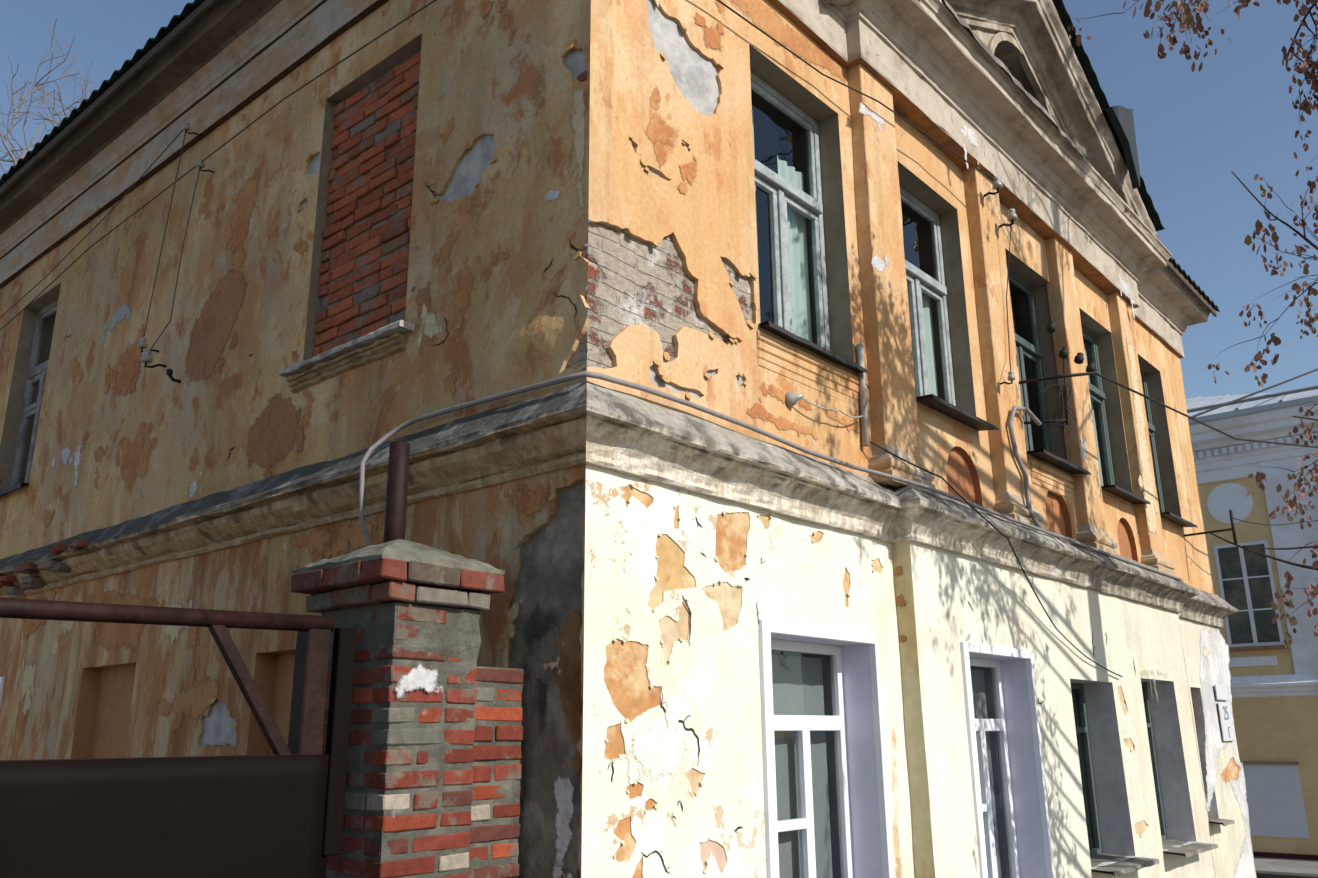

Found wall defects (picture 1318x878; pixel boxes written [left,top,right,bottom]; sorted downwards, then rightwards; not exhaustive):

flaking render [646,0,848,116]
flaking render [430,135,497,203]
peeling [564,42,587,209]
peeling [629,88,697,194]
flaking render [566,223,758,399]
peeling [736,372,871,440]
peeling [624,483,653,508]
peeling [94,622,146,652]
peeling [147,666,237,748]
flaking render [496,481,585,878]
crack [656,693,700,766]
peeling [604,506,772,878]